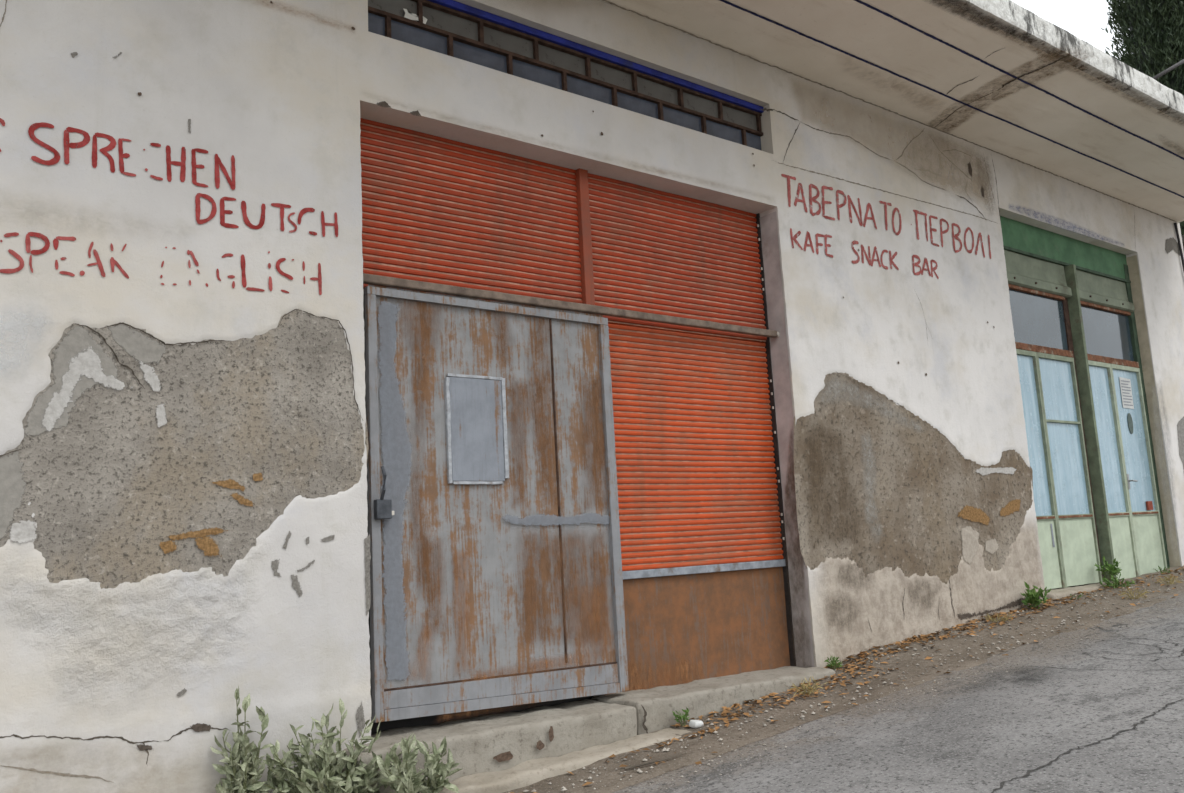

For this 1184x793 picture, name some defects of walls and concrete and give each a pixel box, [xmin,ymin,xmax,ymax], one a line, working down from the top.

flaking render [0,309,369,597]
flaking render [794,371,1033,584]
crack [4,766,114,783]
crack [0,727,228,764]